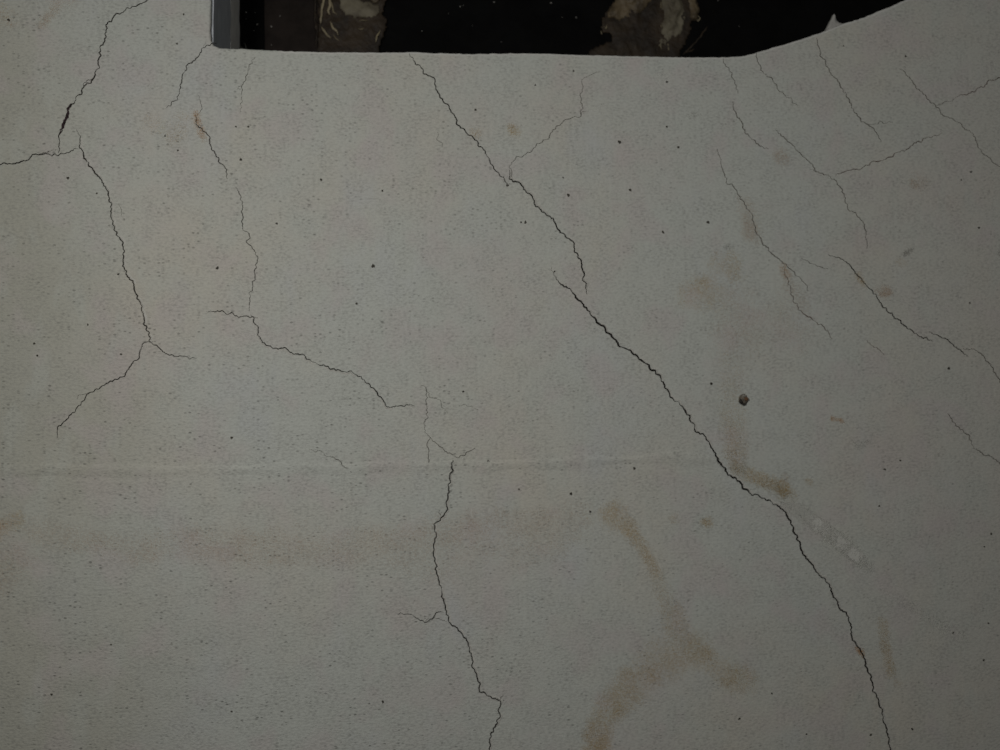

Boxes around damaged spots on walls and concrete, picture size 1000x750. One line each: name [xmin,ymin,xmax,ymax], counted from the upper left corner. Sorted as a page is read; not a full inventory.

crack [0,0,194,437]
crack [171,43,503,750]
crack [409,54,893,750]
crack [717,150,1000,380]
crack [723,38,1000,241]